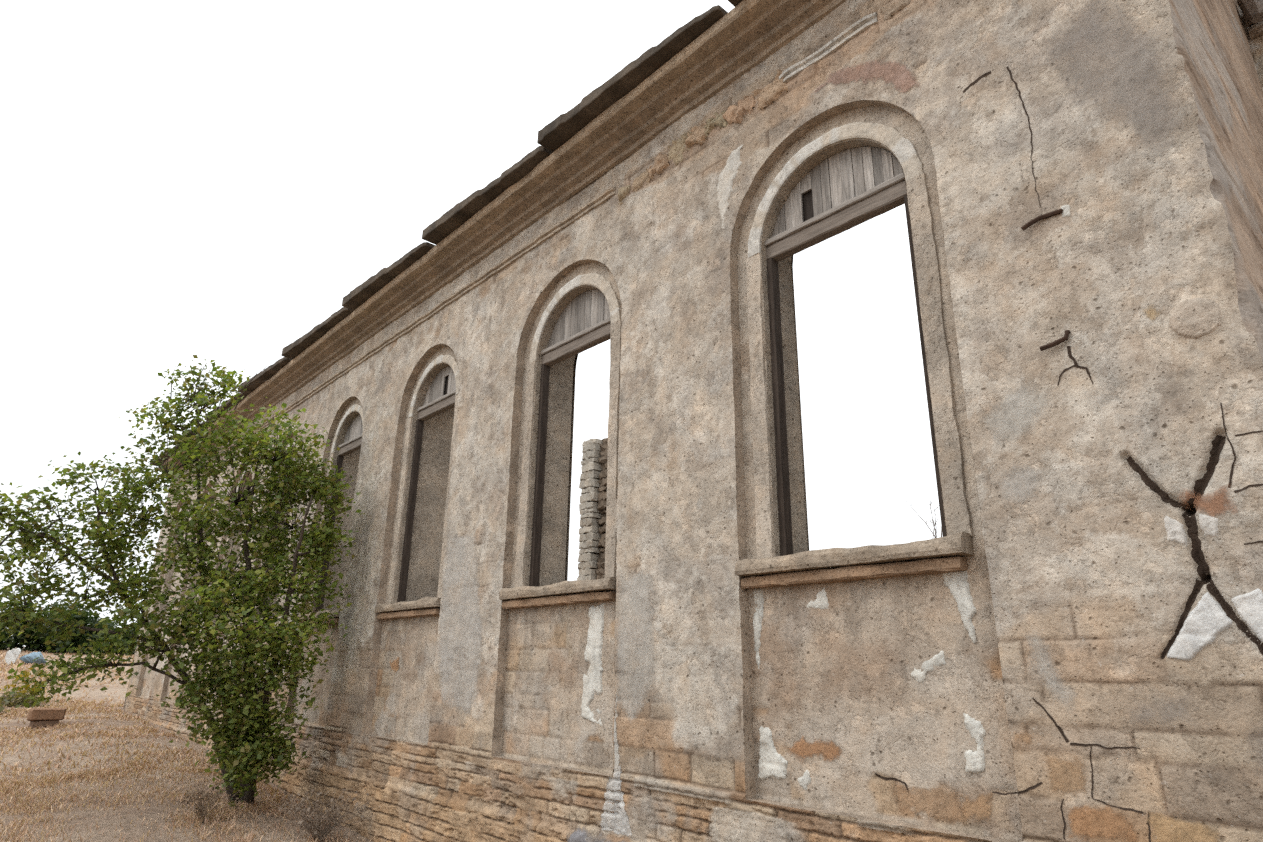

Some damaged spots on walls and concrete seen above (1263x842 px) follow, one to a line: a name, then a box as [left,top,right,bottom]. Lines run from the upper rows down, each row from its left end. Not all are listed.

flaking render [815,60,919,92]
flaking render [618,69,788,205]
flaking render [717,144,743,230]
crack [1057,346,1093,386]
crack [1126,403,1263,659]
flaking render [581,603,605,727]
flaking render [618,575,653,718]
flaking render [943,570,977,644]
peeling [1167,589,1263,661]
flaking render [758,726,840,790]
flaking render [963,713,986,774]
crack [992,698,1151,842]